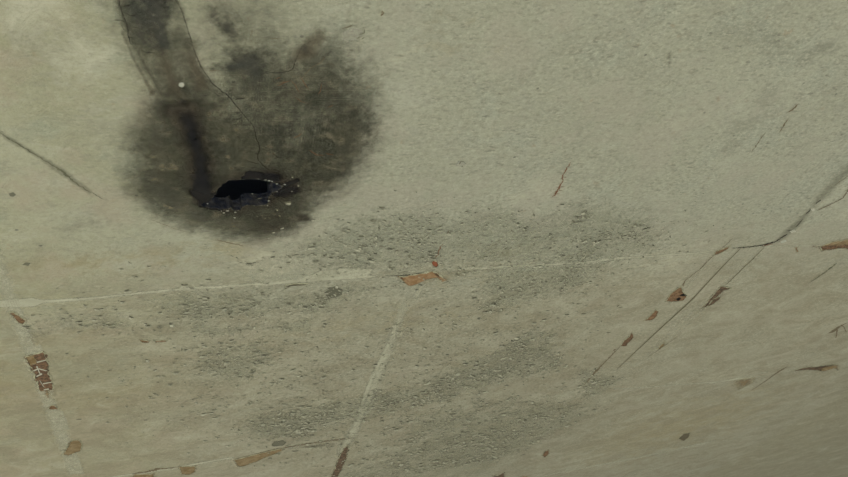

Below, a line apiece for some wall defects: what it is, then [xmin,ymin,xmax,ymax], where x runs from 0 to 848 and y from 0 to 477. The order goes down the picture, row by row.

damp [121,0,361,237]
crack [1,133,102,199]
spalling [201,176,293,246]
corrosion [396,244,446,286]
corrosion [812,239,848,251]
spalling [22,200,688,477]
crack [584,239,774,385]
corrosion [24,351,58,410]
corrosion [62,439,83,456]